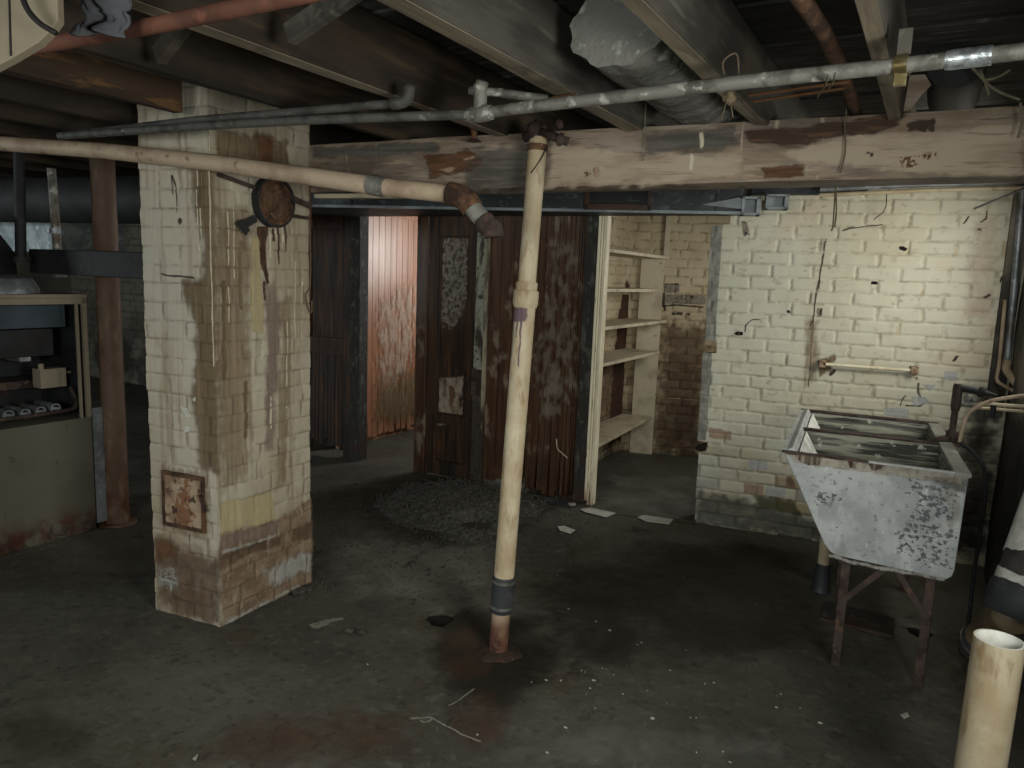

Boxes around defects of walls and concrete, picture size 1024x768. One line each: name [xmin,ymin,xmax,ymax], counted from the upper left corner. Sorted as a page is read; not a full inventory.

damp [198,131,289,164]
peeling [424,146,527,193]
peeling [543,115,1024,189]
damp [182,169,312,482]
damp [657,324,706,457]
flaking render [219,500,312,625]